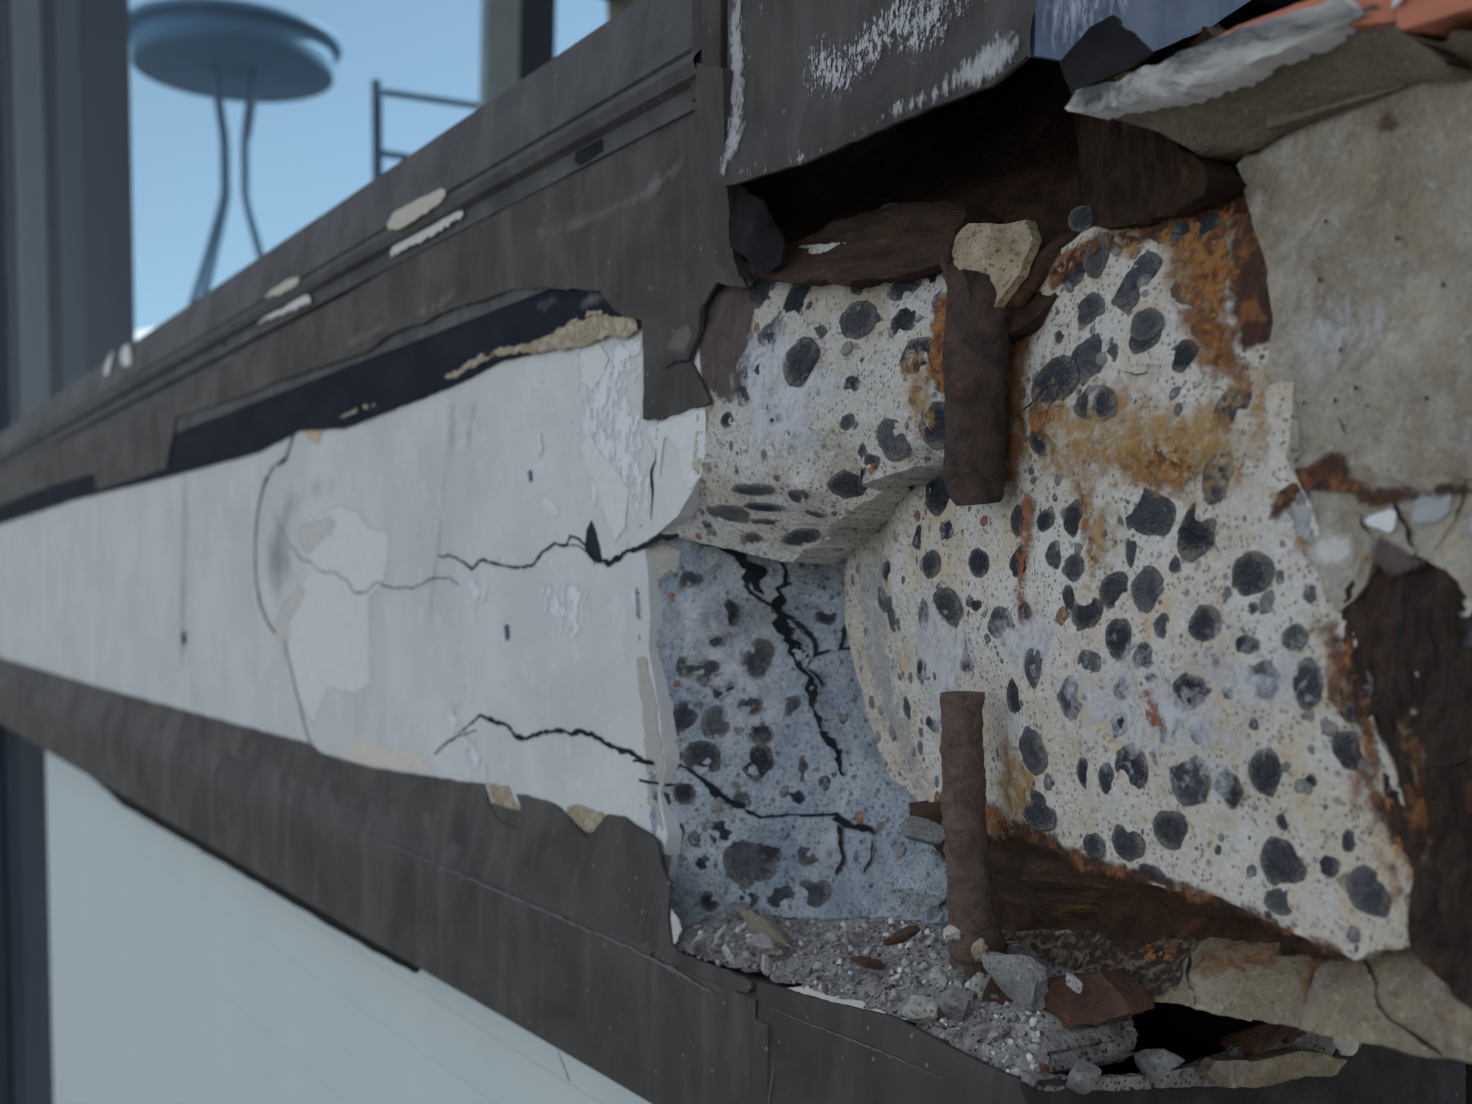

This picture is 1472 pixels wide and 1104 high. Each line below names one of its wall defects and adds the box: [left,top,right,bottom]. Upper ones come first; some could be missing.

peeling [275,505,389,724]
peeling [345,735,435,771]
crack [254,420,850,777]
crack [434,714,875,877]
spalling [445,206,1472,1063]
corrosion [1005,95,1273,618]
corrosion [1269,453,1472,519]
corrosion [1317,623,1428,901]